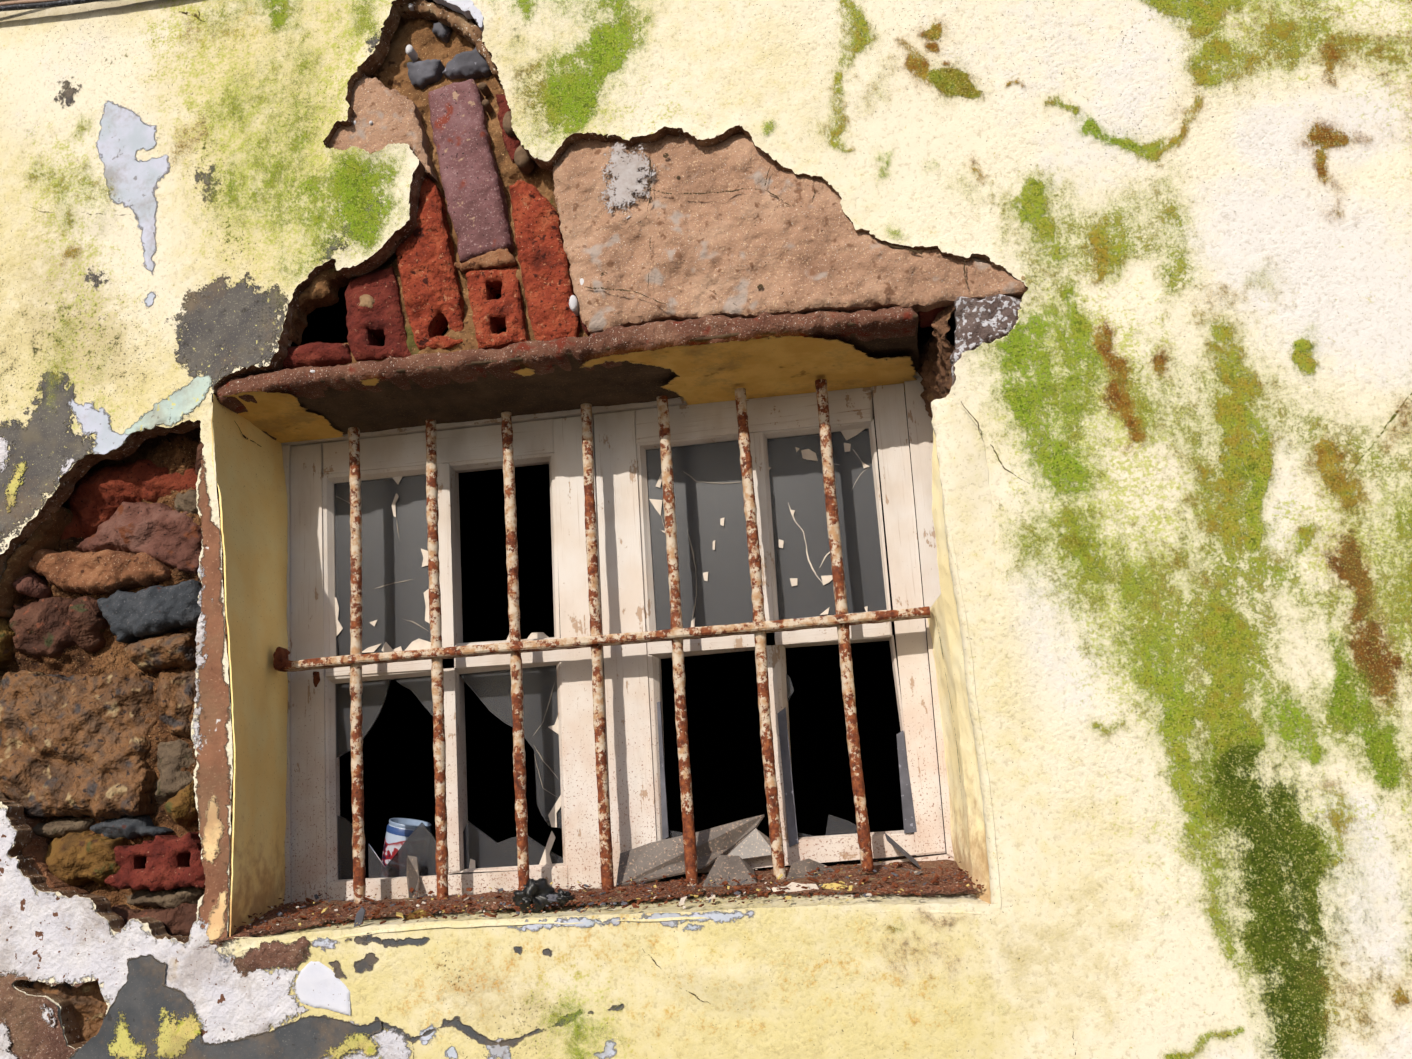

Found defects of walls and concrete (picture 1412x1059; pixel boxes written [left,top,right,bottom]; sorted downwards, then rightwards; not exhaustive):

water stain [1045,96,1166,162]
flaking render [0,0,1027,1059]
water stain [1183,275,1275,553]
crack [1347,393,1412,479]